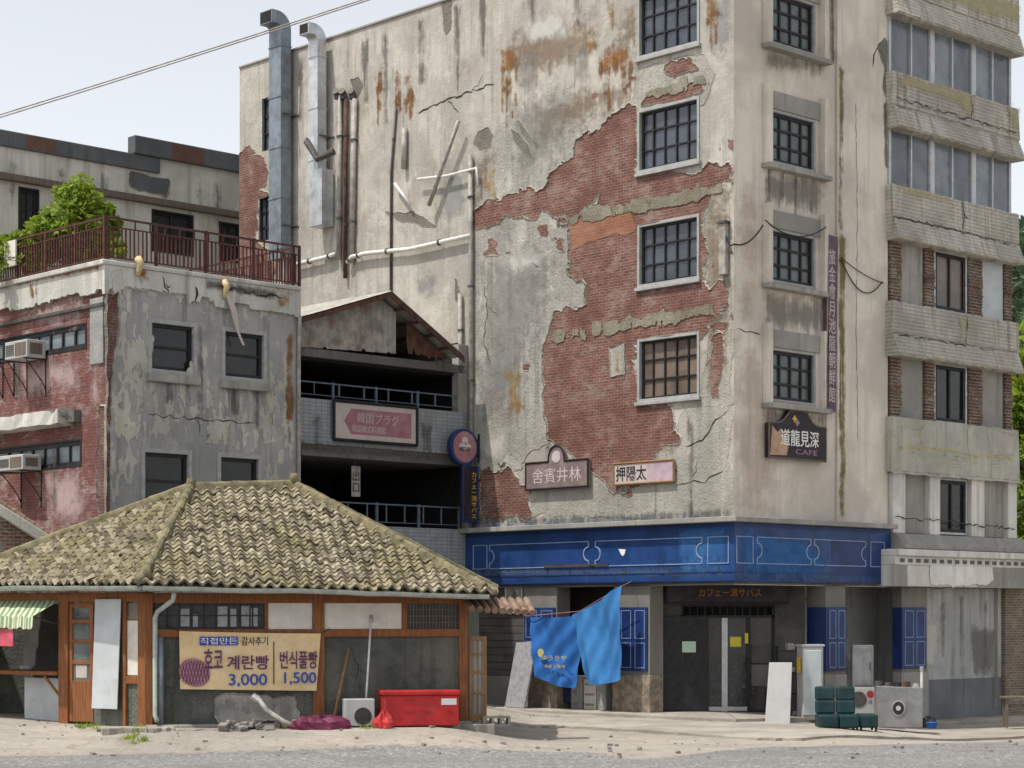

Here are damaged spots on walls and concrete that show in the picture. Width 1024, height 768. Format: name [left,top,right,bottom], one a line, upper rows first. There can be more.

corrosion [706,0,719,47]
corrosion [395,71,414,118]
crack [418,75,494,114]
corrosion [501,20,633,137]
flaking render [239,145,275,282]
crack [896,204,1011,245]
crack [163,277,282,301]
flaking render [466,53,735,524]
peeling [95,269,295,516]
corrosion [286,335,294,420]
crack [677,410,728,486]
crack [895,516,1015,530]